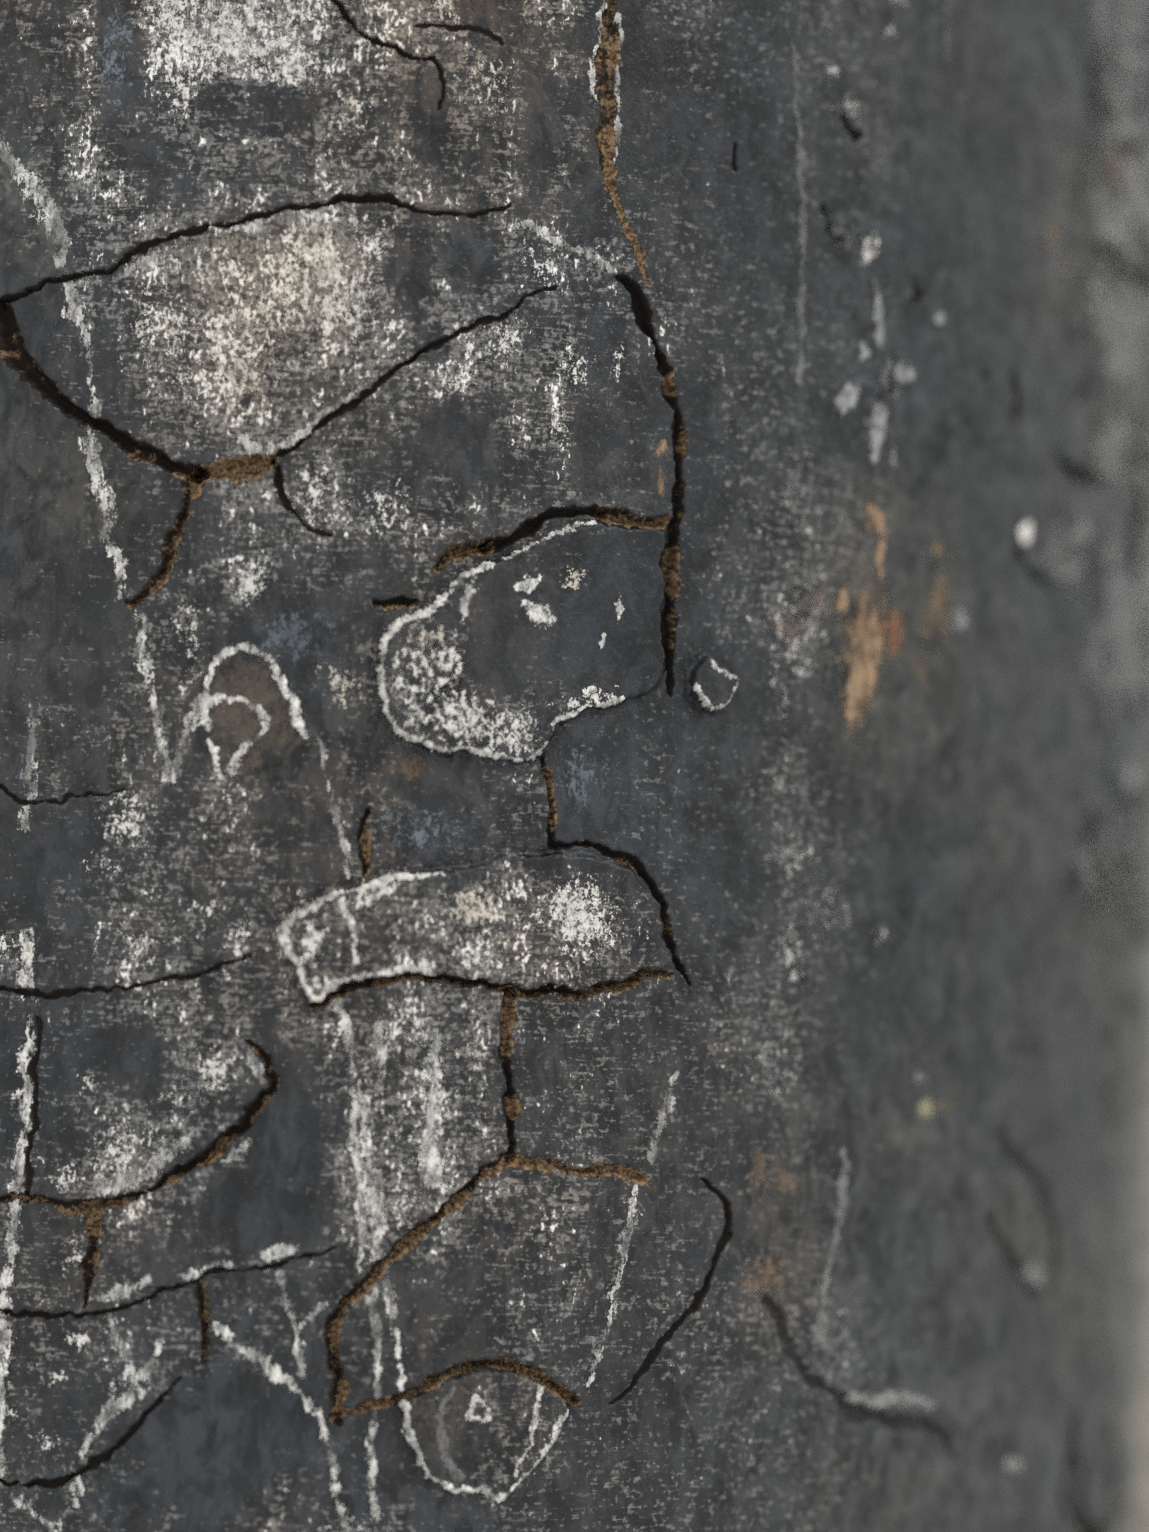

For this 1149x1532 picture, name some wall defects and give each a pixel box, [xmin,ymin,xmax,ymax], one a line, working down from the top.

crack [0,193,558,610]
crack [332,0,504,110]
crack [372,0,688,697]
crack [730,143,738,173]
crack [0,783,125,805]
crack [0,953,336,1488]
crack [309,754,733,1429]